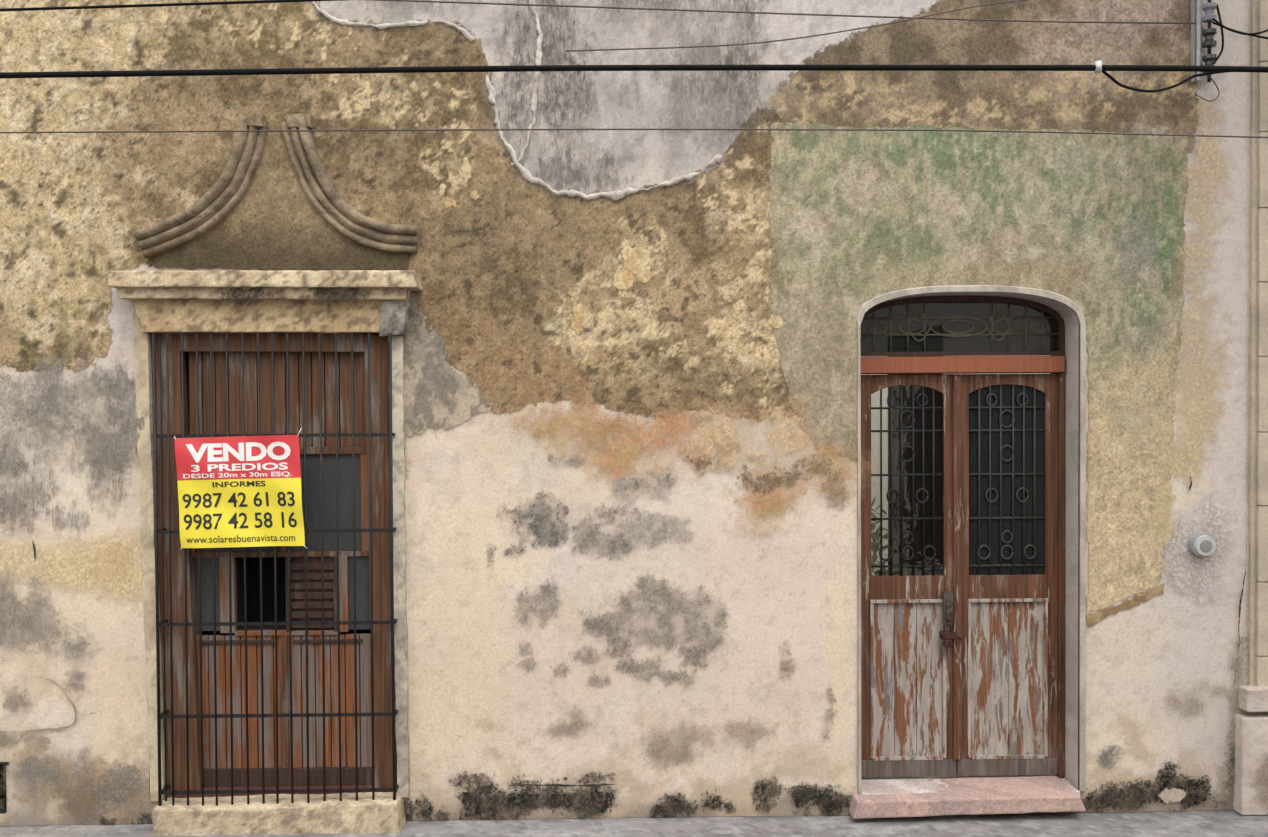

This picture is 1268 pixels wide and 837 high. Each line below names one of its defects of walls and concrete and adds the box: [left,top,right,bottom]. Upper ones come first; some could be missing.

water stain [490,0,769,191]
peeling [439,183,457,209]
peeling [462,157,480,199]
peeling [613,246,653,290]
peeling [571,302,591,334]
flaking render [403,291,491,437]
peeling [768,98,1229,627]
water stain [553,572,731,687]
water stain [404,771,619,821]
water stain [647,789,736,818]
water stain [751,777,852,816]
water stain [1081,745,1235,813]